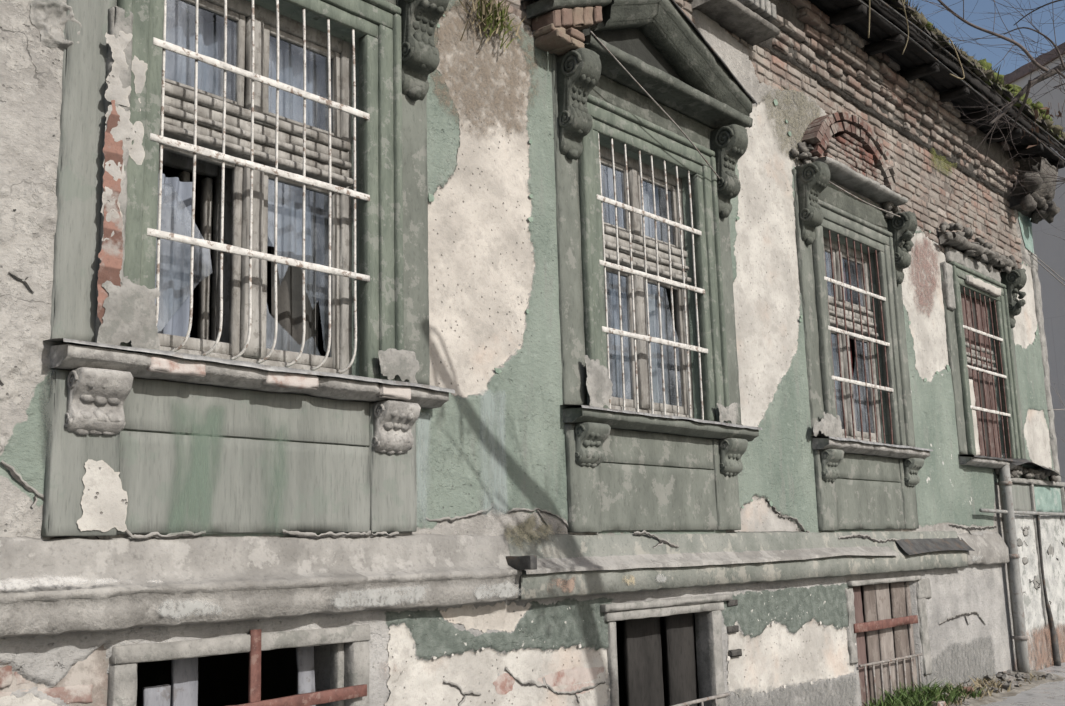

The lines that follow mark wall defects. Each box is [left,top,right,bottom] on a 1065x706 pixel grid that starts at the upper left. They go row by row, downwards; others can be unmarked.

spalling [97,31,206,378]
spalling [377,0,603,401]
spalling [717,29,1038,427]
crack [8,271,35,293]
spalling [585,355,613,410]
spalling [1024,409,1052,468]
crack [1,460,44,508]
spalling [77,459,128,532]
crack [444,679,481,706]
spalling [384,623,610,706]
crack [505,667,606,703]
spalling [727,587,858,698]